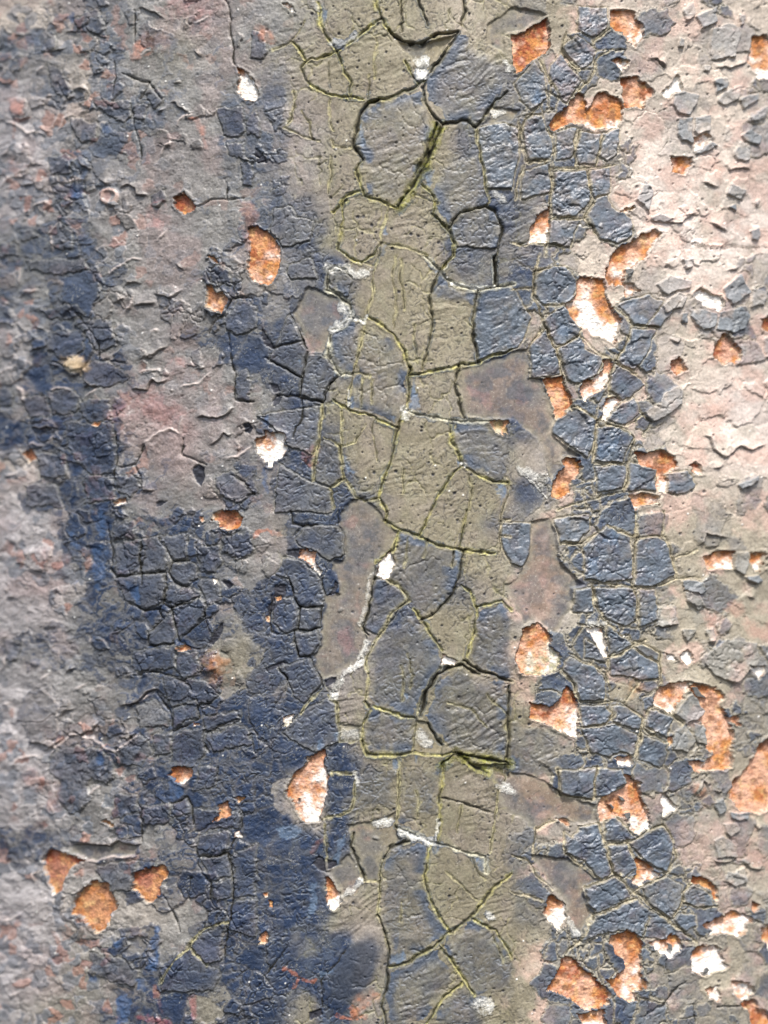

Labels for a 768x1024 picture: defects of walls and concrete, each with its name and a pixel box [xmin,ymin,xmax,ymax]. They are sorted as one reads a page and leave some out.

crack [202,188,236,206]
rust [565,229,663,345]
peeling [609,0,768,491]
crack [209,0,720,1024]
peeling [586,626,607,658]
peeling [653,552,768,760]
crack [157,796,244,985]
rust [285,749,330,823]
rust [623,677,768,817]
peeling [672,778,768,901]
rust [546,901,768,1024]
crack [645,963,739,1022]